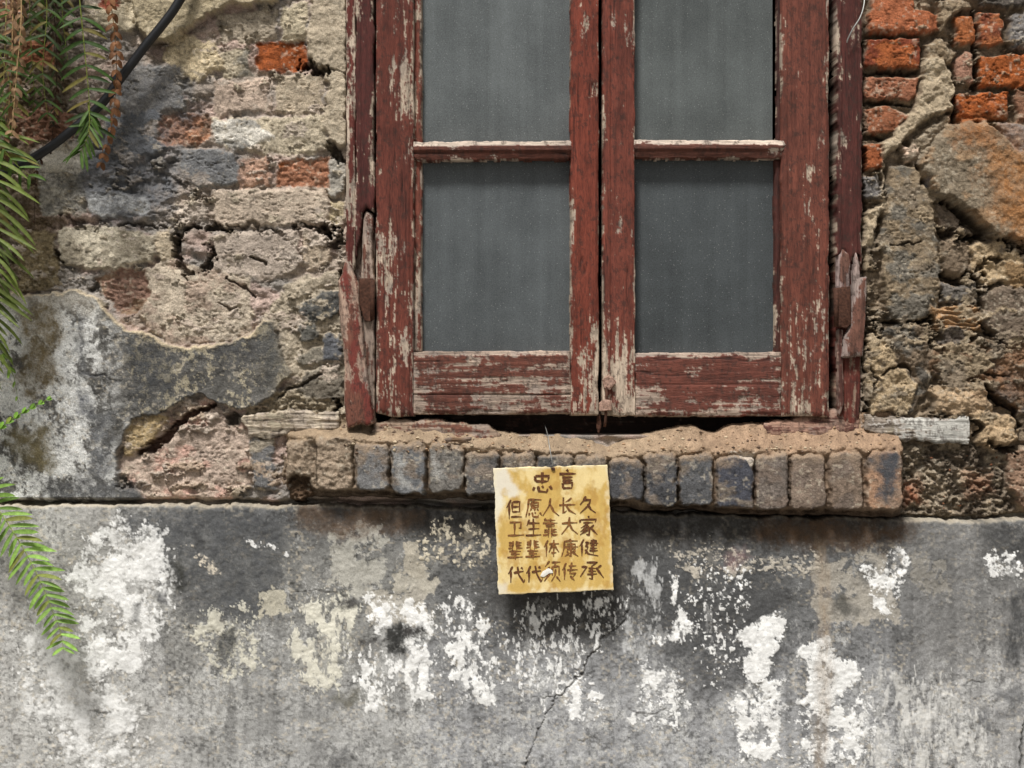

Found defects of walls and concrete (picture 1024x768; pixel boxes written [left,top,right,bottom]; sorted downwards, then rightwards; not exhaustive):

flaking render [131,0,280,45]
spalling [253,38,346,77]
spalling [274,153,331,191]
spalling [169,220,234,281]
flaking render [0,264,816,768]
leakage [101,500,331,667]
leakage [332,593,362,612]
leakage [355,502,814,721]
crack [524,566,634,768]
leakage [325,683,368,711]
crack [623,704,668,718]
leakage [324,743,352,768]